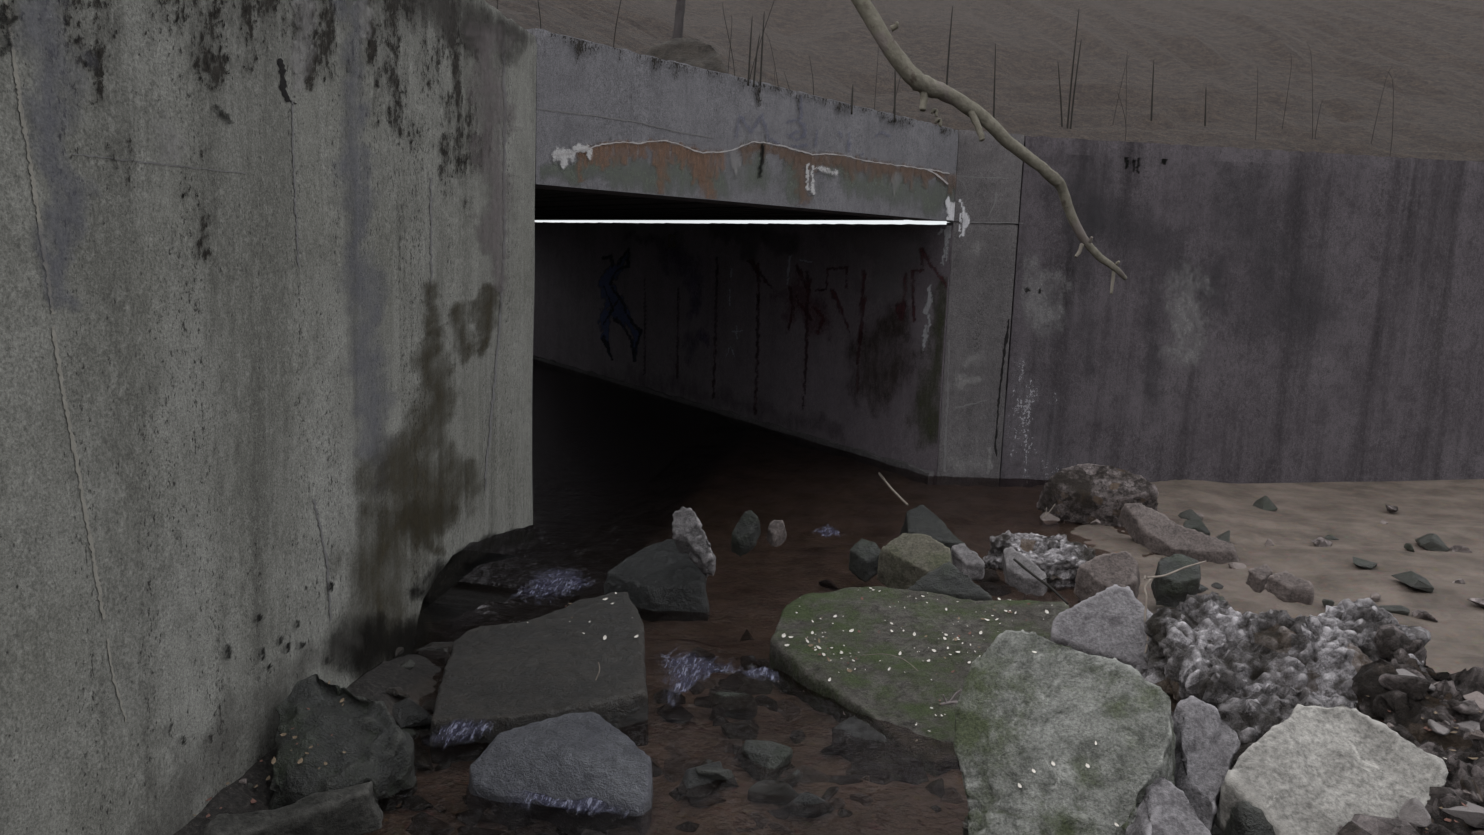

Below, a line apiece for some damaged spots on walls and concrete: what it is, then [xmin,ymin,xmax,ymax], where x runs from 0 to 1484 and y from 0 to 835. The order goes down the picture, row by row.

water stain [48,0,120,108]
water stain [144,0,915,208]
water stain [182,147,222,272]
rust [576,140,957,203]
water stain [921,284,933,351]
water stain [325,284,534,675]
water stain [261,620,306,673]